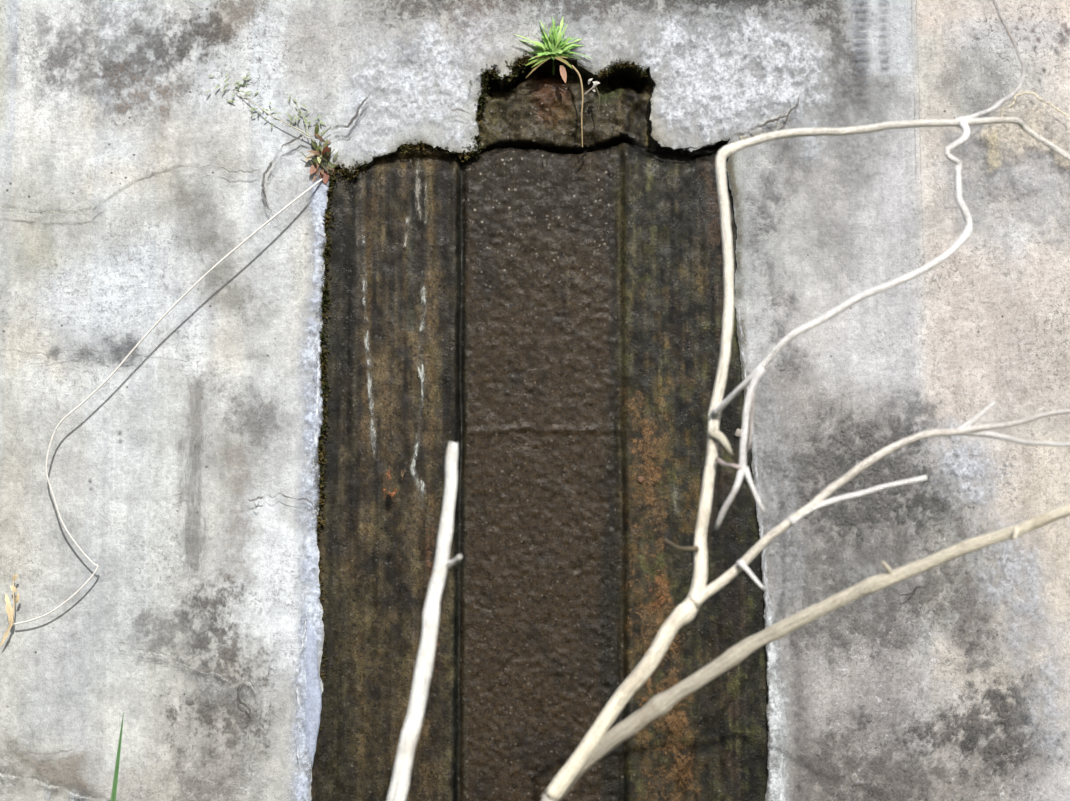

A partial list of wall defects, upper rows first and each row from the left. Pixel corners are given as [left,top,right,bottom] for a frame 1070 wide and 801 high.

damp [102,0,265,113]
crack [203,134,310,210]
crack [335,96,369,130]
damp [352,0,518,155]
damp [532,0,868,380]
damp [365,332,375,436]
spalling [296,65,791,801]
rust [620,388,675,655]
damp [752,391,995,627]
rust [639,635,683,707]
damp [767,538,1068,801]
rust [634,697,696,801]